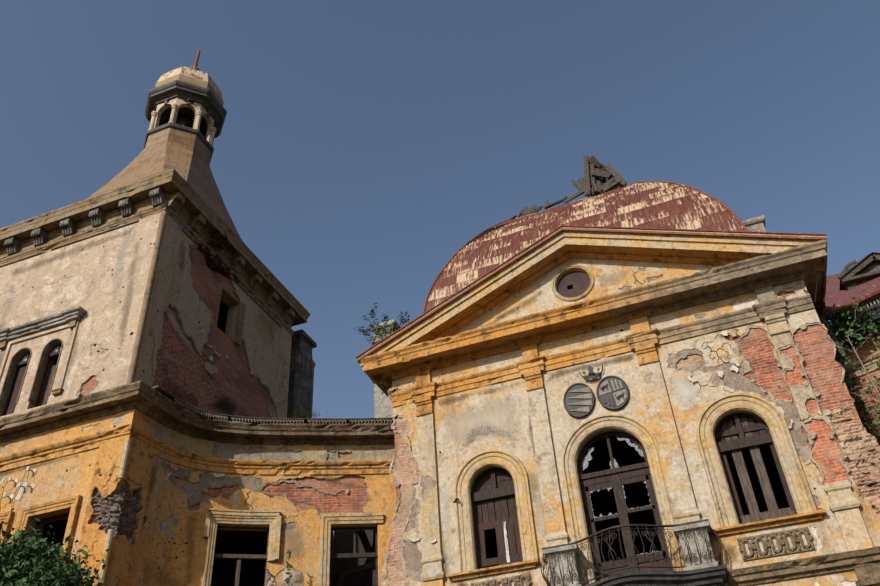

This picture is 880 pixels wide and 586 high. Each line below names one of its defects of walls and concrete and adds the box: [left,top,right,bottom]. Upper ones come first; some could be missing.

flaking render [152,243,277,418]
flaking render [716,322,880,519]
spalling [91,484,240,575]
spalling [281,522,297,531]
flaking render [258,479,369,515]
flaking render [379,413,437,586]
flaking render [810,526,822,553]